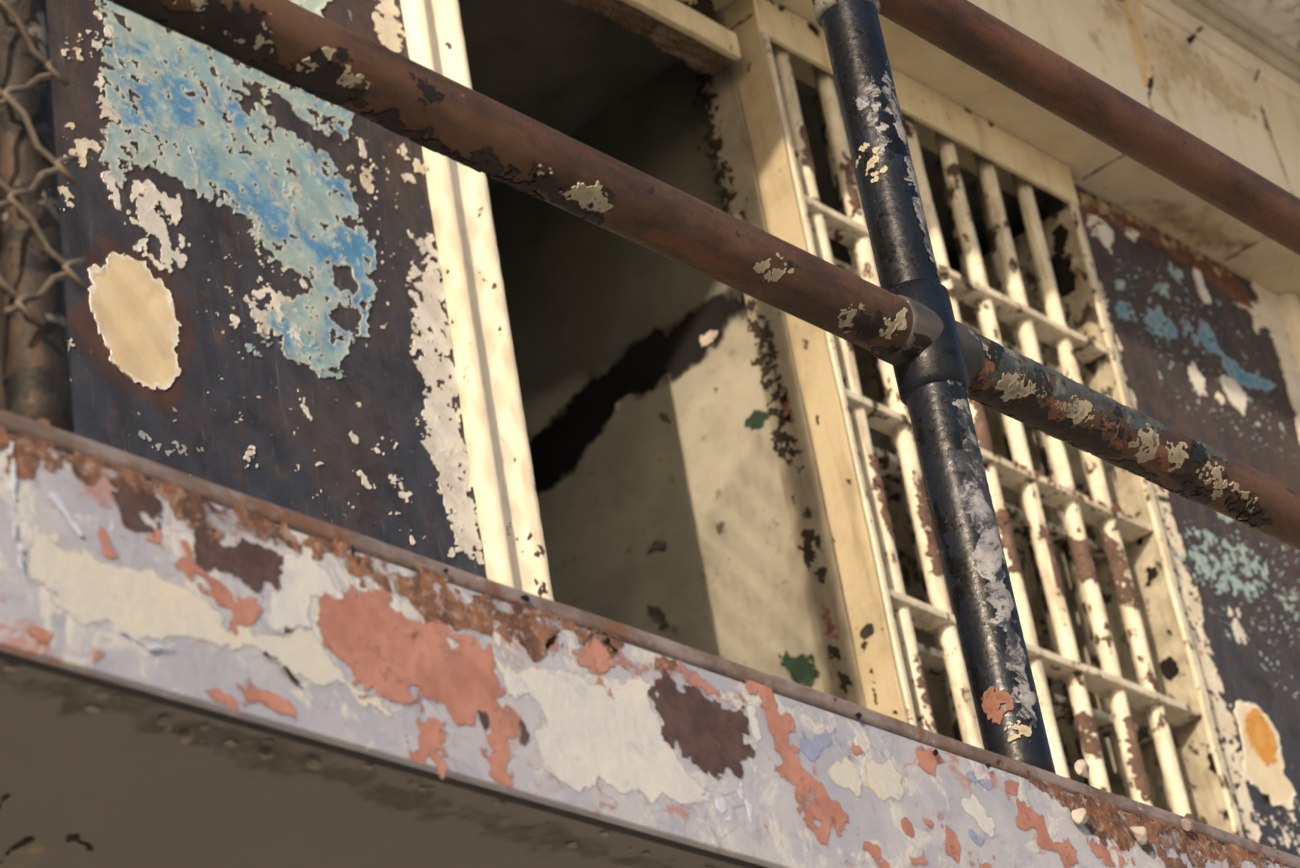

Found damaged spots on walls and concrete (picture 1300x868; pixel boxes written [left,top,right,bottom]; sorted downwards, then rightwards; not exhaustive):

peeling [58,182,74,211]
peeling [61,0,617,390]
peeling [405,230,484,565]
peeling [174,540,264,635]
rust [0,418,638,662]
peeling [353,470,426,545]
peeling [316,578,521,788]
peeling [745,679,891,868]
peeling [856,623,883,652]
peeling [901,817,995,868]
peeling [967,772,1135,868]
peeling [948,193,1300,853]